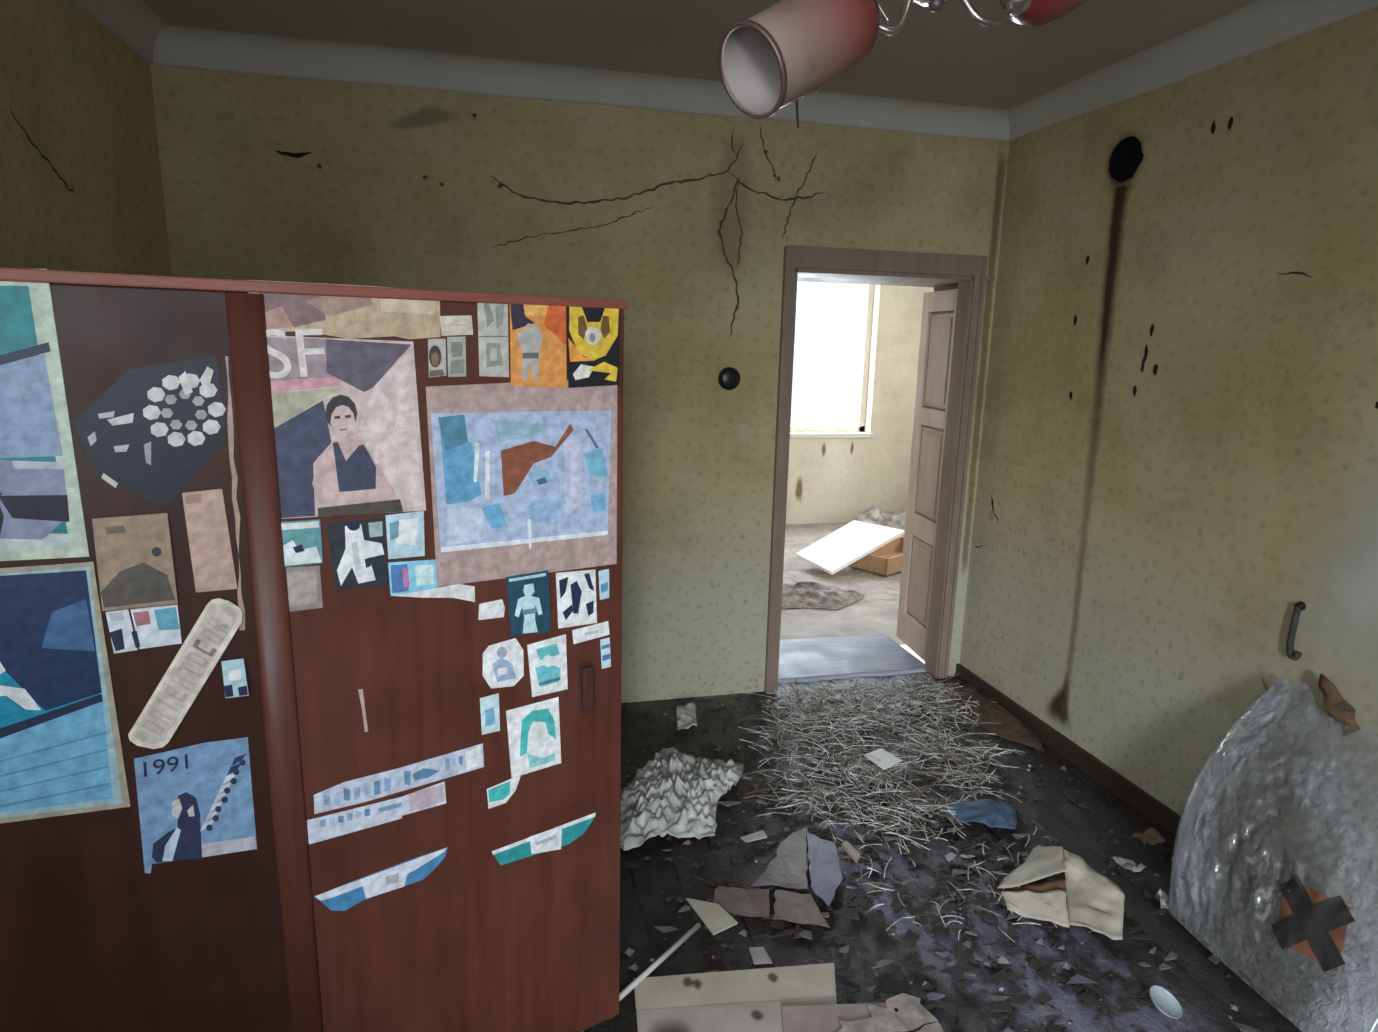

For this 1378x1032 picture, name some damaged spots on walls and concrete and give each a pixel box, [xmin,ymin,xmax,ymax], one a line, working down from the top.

crack [489,123,824,337]